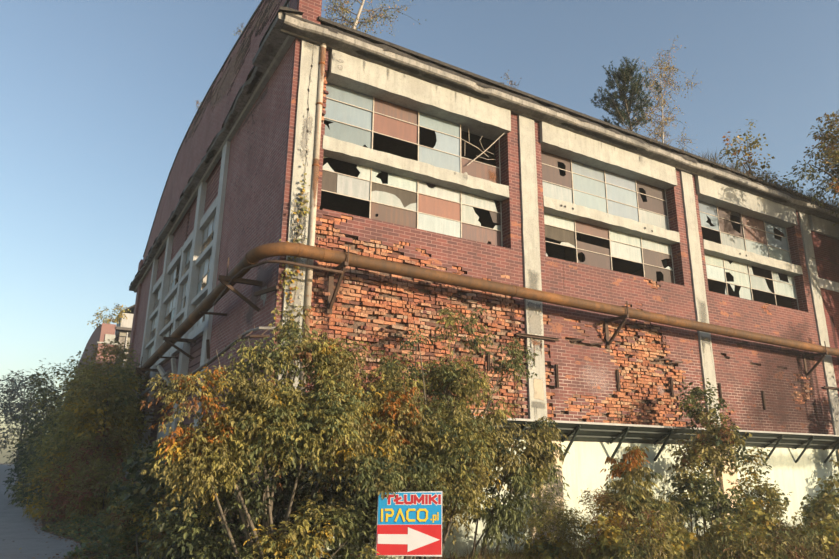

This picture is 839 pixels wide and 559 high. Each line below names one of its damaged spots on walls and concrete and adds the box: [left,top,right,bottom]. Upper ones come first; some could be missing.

spalling [185,0,282,142]
spalling [292,194,466,275]
spalling [282,256,555,419]
spalling [564,302,691,427]
spalling [792,373,812,409]